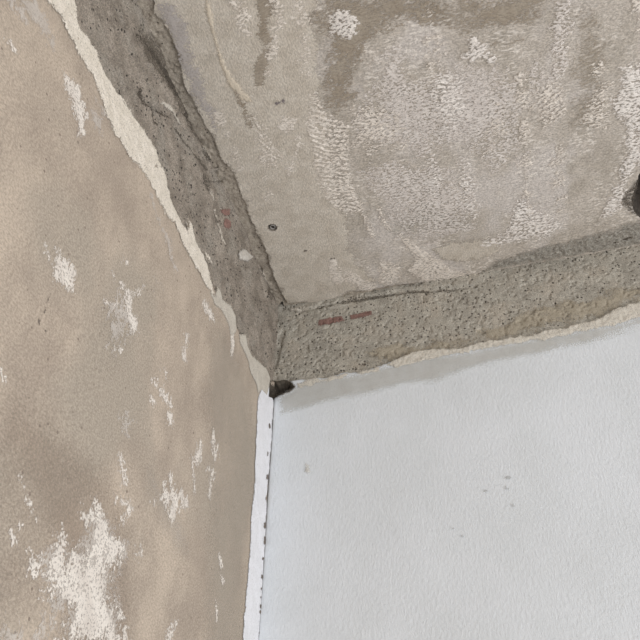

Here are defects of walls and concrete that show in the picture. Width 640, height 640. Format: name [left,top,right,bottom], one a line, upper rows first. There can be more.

spalling [43,0,640,401]